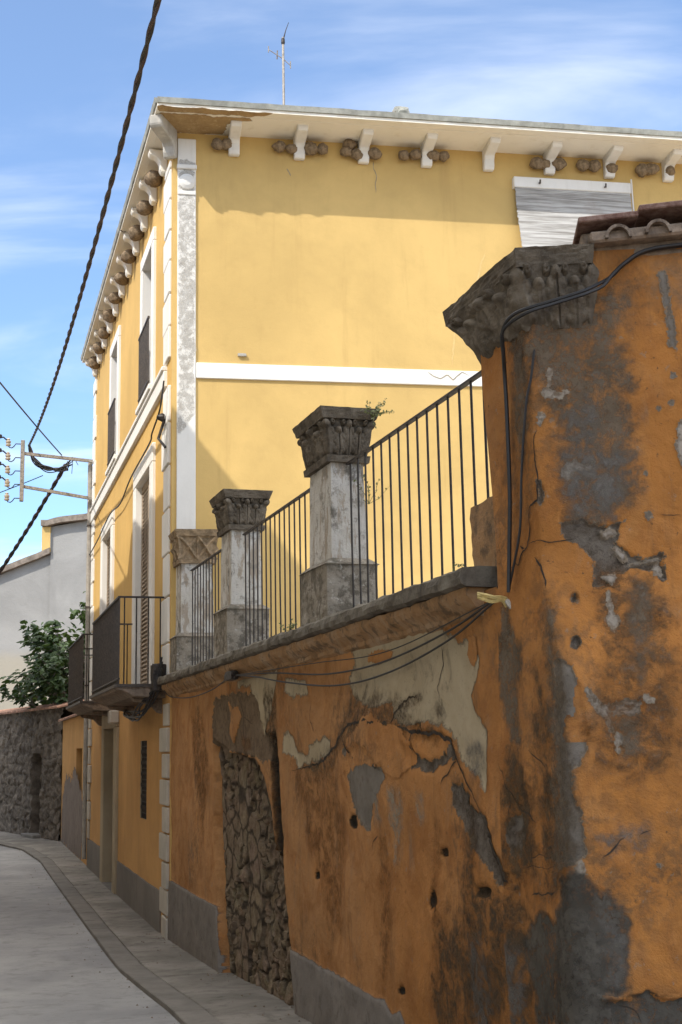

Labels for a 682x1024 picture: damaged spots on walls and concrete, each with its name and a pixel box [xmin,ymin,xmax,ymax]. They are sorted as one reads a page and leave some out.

spalling [158,105,272,135]
peeling [536,367,570,426]
leakage [510,290,642,524]
crack [511,430,572,586]
spalling [560,517,667,633]
spalling [212,670,385,831]
peeling [349,630,487,793]
crack [292,647,559,896]
spalling [451,782,525,885]
leakage [431,599,632,1024]